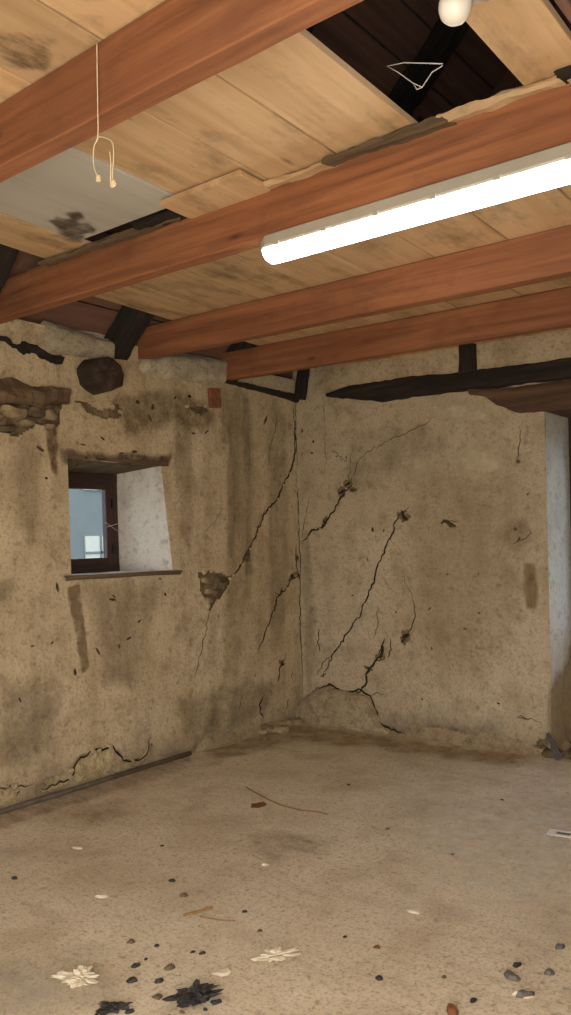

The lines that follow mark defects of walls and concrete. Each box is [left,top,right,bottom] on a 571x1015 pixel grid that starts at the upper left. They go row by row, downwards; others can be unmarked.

leakage [65,450,169,467]
spalling [198,569,232,610]
crack [222,399,432,733]
leakage [68,585,88,672]
crack [0,736,151,790]